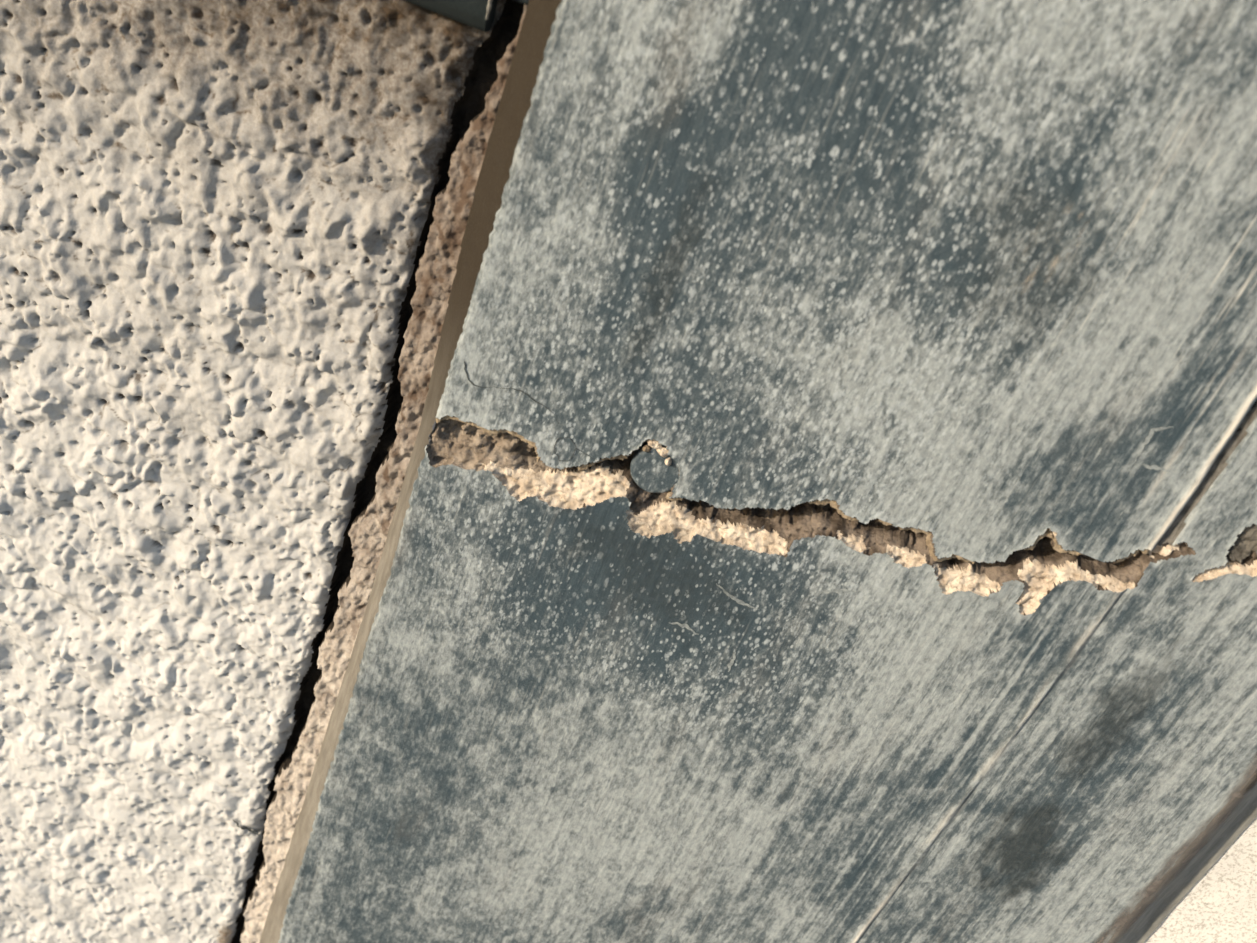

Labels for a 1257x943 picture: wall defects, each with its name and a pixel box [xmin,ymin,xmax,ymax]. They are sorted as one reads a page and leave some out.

crack [231,0,524,943]
crack [426,361,1257,616]